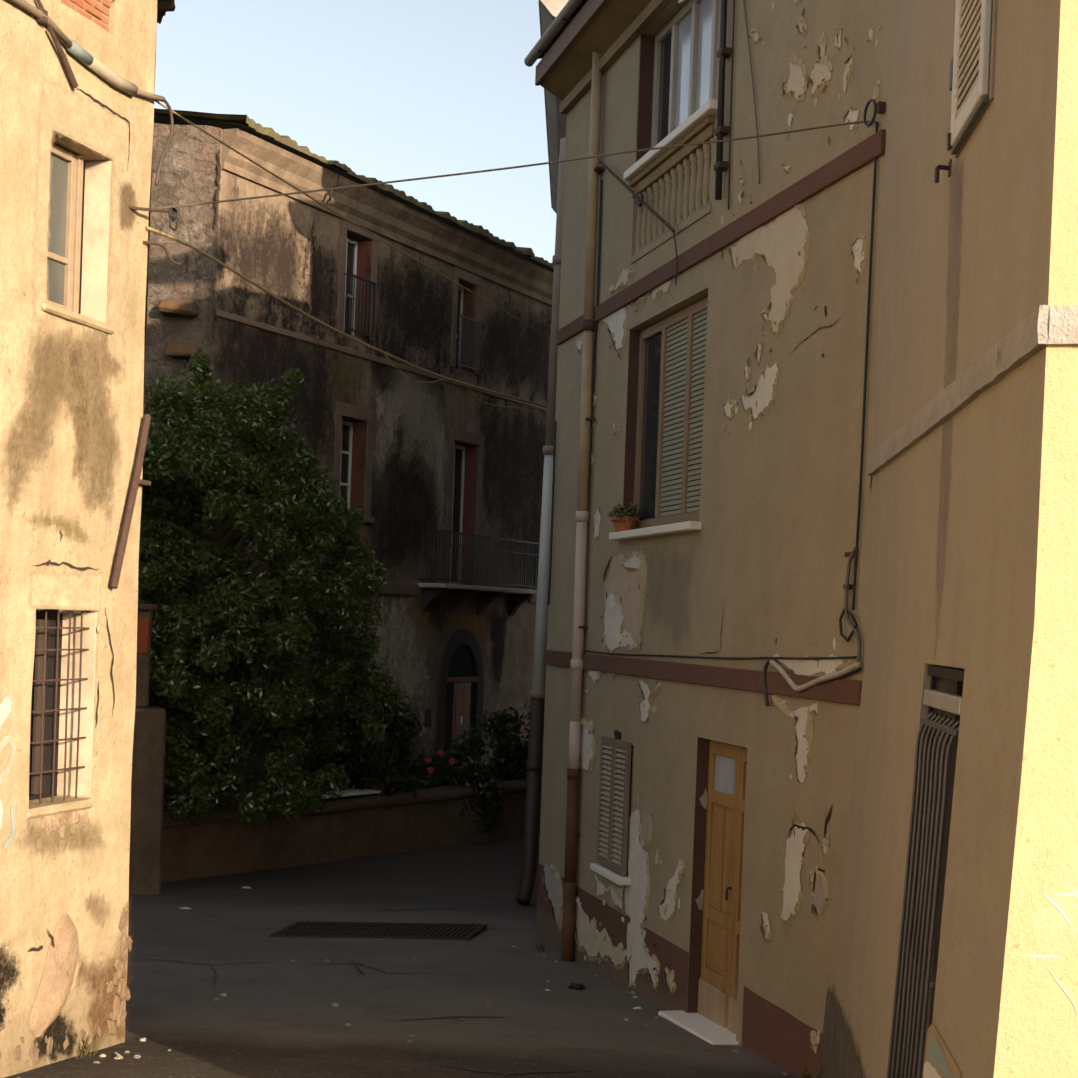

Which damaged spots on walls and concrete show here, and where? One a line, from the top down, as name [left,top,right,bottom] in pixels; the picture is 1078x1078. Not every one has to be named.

peeling [782,0,859,141]
water stain [209,211,347,463]
peeling [721,203,810,434]
water stain [8,334,119,503]
crack [33,531,100,571]
water stain [349,252,552,752]
flaking render [597,546,648,657]
peeling [770,694,821,784]
peeling [542,795,685,994]
peeling [759,808,833,943]
water stain [0,945,18,1027]